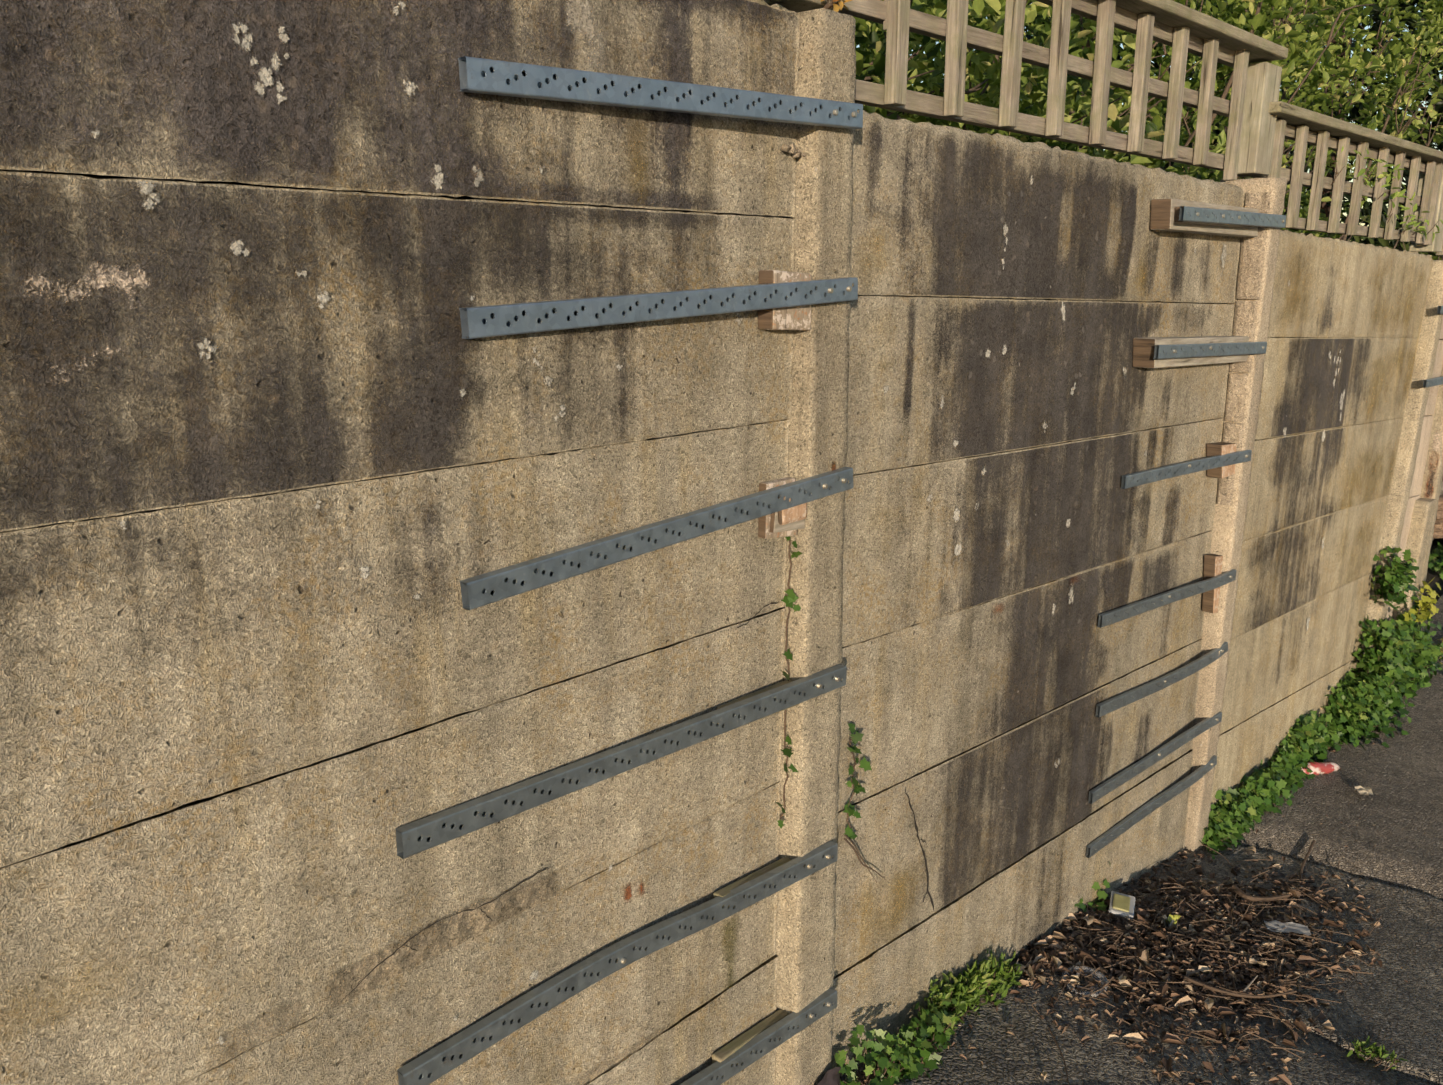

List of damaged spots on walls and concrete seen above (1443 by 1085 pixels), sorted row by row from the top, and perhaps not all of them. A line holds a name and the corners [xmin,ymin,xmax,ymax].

water stain [639,0,794,92]
water stain [869,124,882,209]
water stain [0,0,720,606]
water stain [1250,271,1415,629]
water stain [898,131,1209,939]
crack [905,787,934,911]
crack [343,867,552,999]